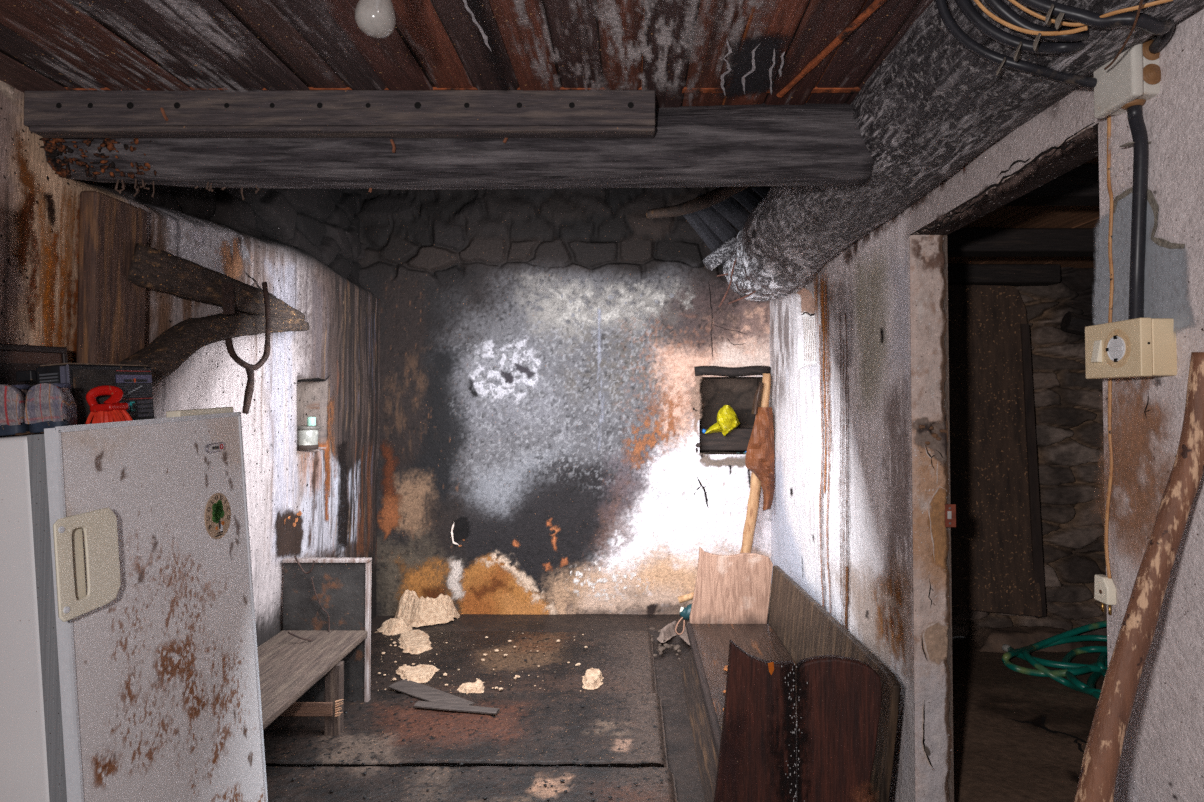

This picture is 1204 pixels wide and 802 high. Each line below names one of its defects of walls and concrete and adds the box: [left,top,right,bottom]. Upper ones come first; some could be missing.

mould [514,0,606,91]
mould [570,0,708,91]
damp [715,0,790,97]
corrosion [27,197,80,362]
corrosion [318,401,336,521]
corrosion [378,444,400,538]
spalling [451,517,469,547]
damp [839,312,849,629]
damp [401,551,556,615]
damp [874,576,905,674]